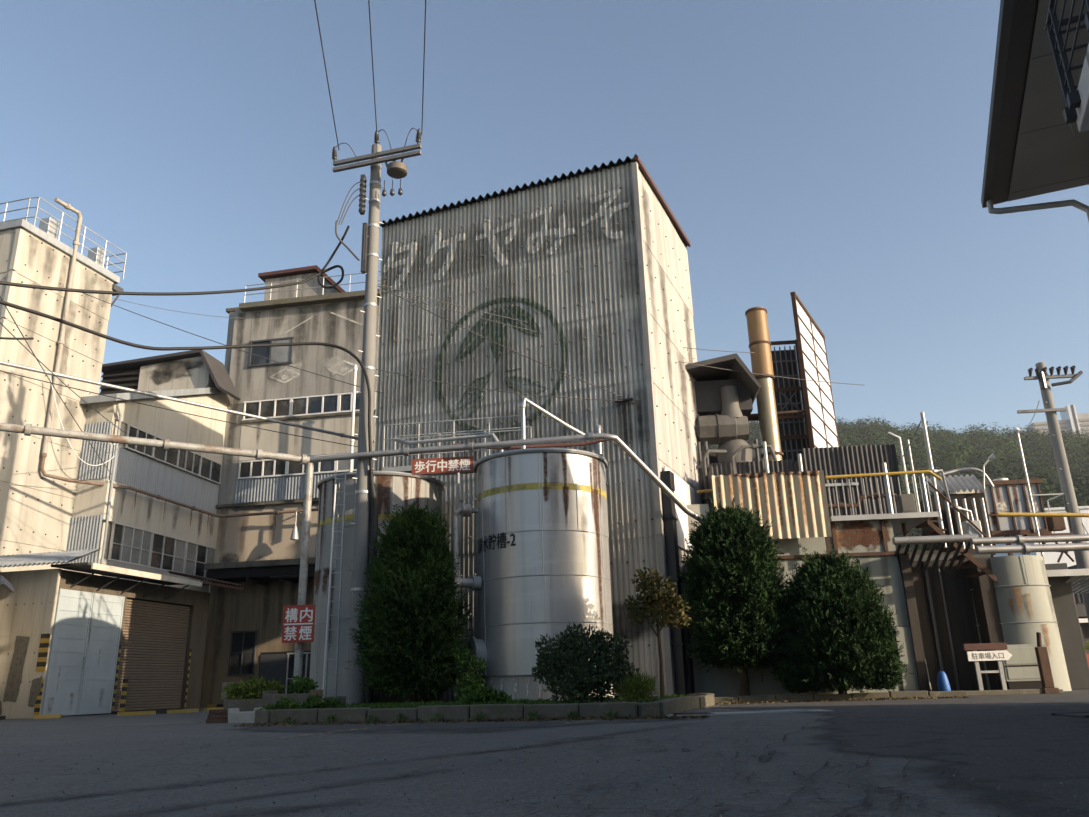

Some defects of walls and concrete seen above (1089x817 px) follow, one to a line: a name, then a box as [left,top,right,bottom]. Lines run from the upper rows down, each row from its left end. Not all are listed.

corrosion [377,475,421,517]
corrosion [717,470,819,524]
corrosion [312,479,335,644]
corrosion [590,457,603,626]
corrosion [832,520,890,550]